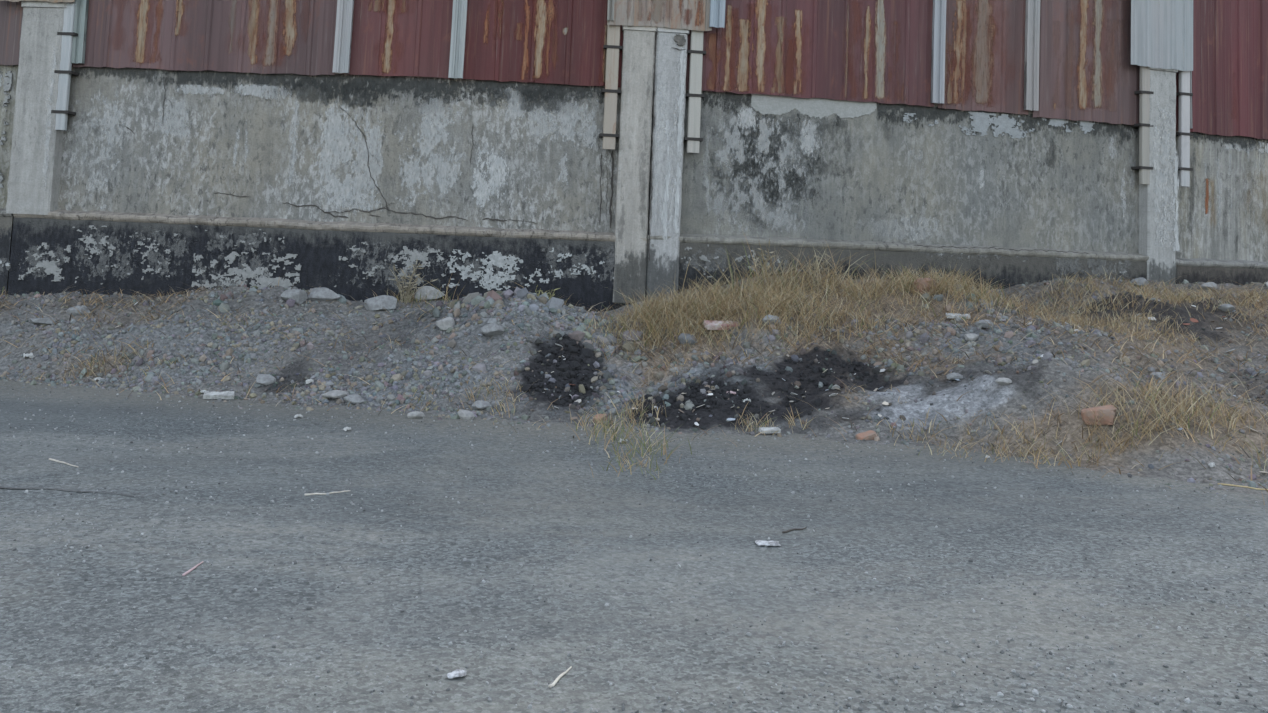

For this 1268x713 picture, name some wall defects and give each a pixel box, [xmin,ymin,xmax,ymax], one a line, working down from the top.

rust [134,0,185,64]
rust [247,0,297,67]
rust [375,0,396,74]
rust [516,0,569,80]
rust [706,0,802,95]
rust [863,0,887,99]
rust [947,0,995,104]
rust [1077,0,1105,110]
crack [283,106,538,224]
water stain [703,91,822,232]
water stain [876,102,1138,142]
peeling [0,225,302,289]